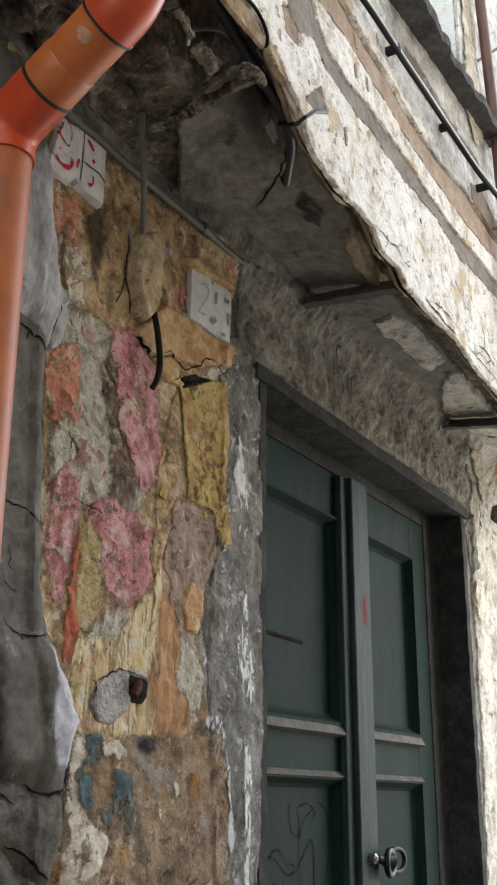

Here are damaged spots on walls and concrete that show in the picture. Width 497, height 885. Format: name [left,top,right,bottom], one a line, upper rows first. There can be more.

crack [256,148,286,210]
crack [116,230,233,381]
peeling [41,189,235,885]
crack [4,615,53,644]
water stain [237,594,254,705]
water stain [206,715,252,885]